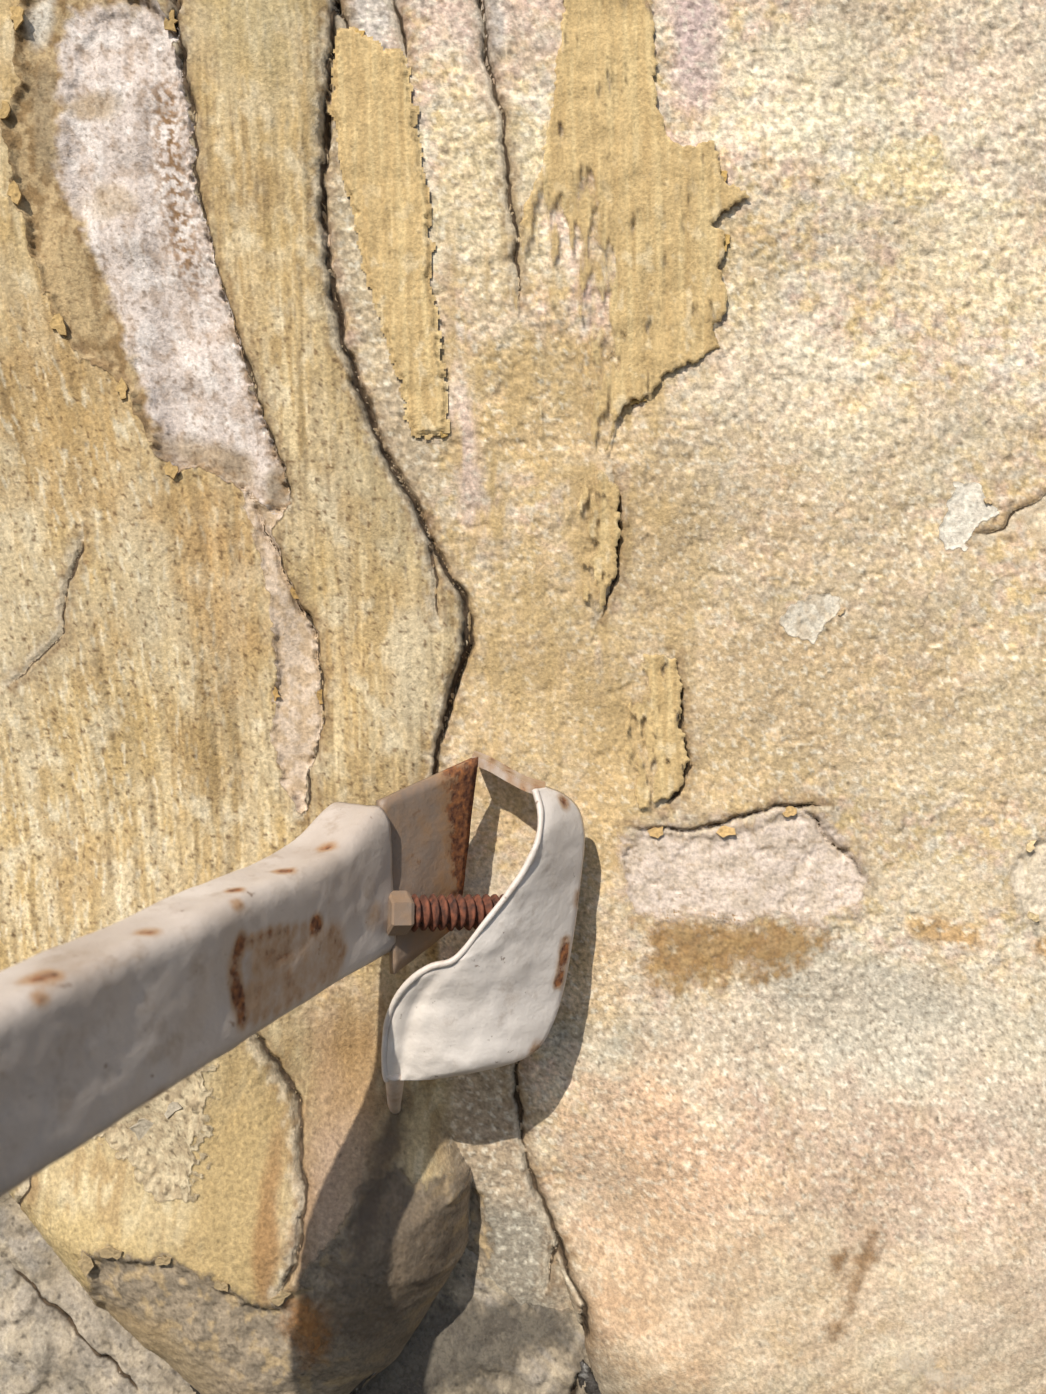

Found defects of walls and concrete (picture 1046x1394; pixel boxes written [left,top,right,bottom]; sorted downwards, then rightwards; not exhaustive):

peeling [328,26,450,440]
crack [479,0,521,297]
peeling [520,0,750,451]
flaking render [0,0,323,814]
crack [320,0,474,775]
crack [19,544,84,678]
peeling [625,654,691,809]
flaking render [620,806,867,929]
crack [15,1270,137,1389]
spalling [93,1063,219,1202]
rust [290,1301,328,1356]
crack [514,1061,589,1335]